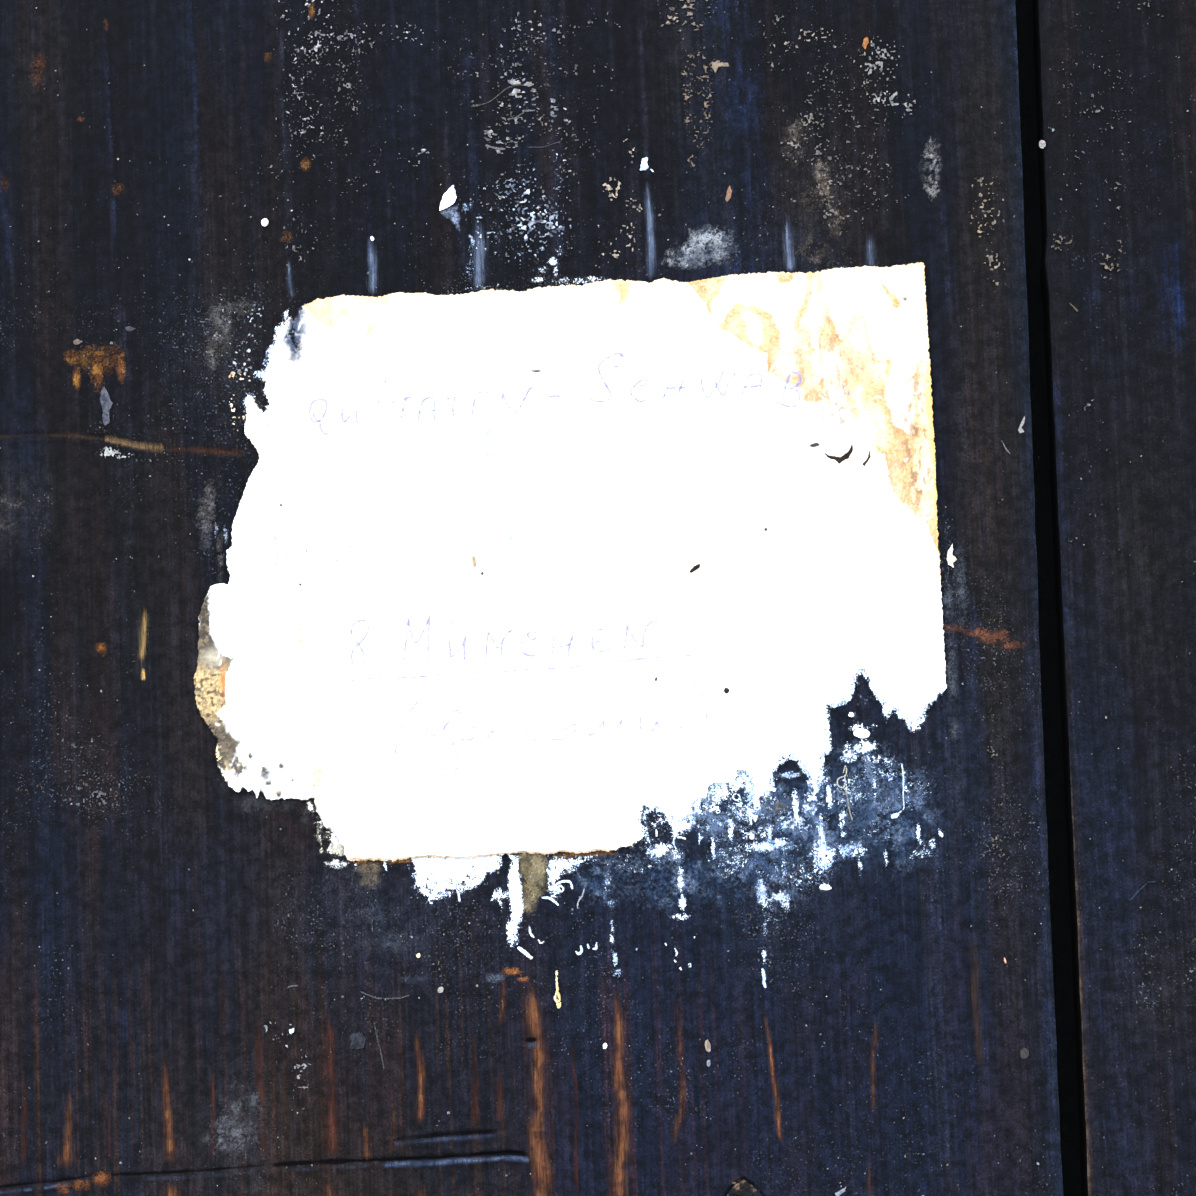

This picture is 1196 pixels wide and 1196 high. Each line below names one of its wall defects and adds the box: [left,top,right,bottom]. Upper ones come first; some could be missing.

peeling [212,297,264,382]
peeling [317,826,345,857]
peeling [655,825,686,871]
peeling [411,854,544,959]
peeling [542,856,586,909]